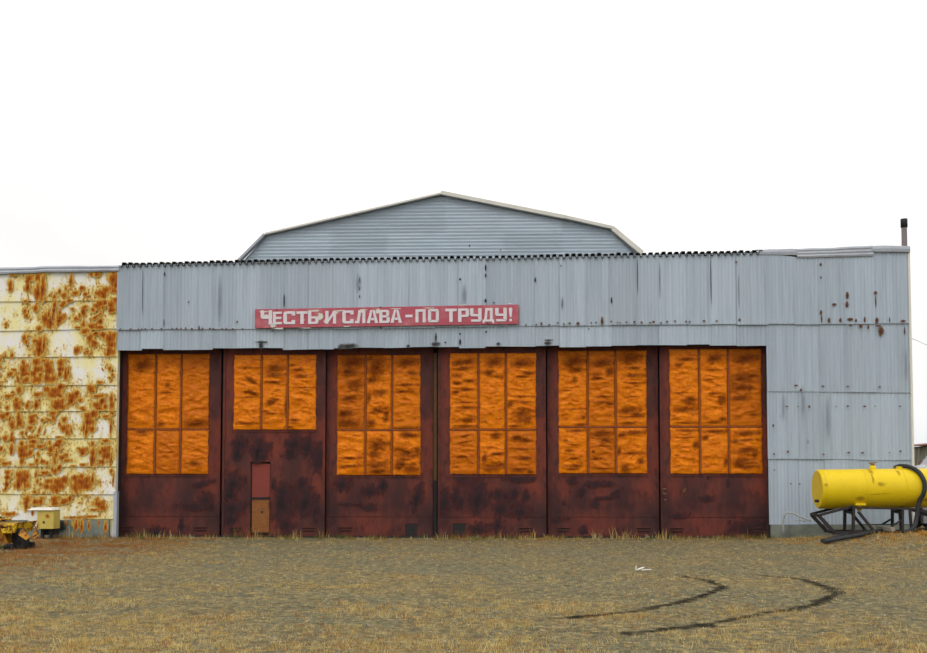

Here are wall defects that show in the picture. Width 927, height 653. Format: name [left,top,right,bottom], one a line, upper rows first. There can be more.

corrosion [0,272,243,534]
corrosion [820,292,890,336]